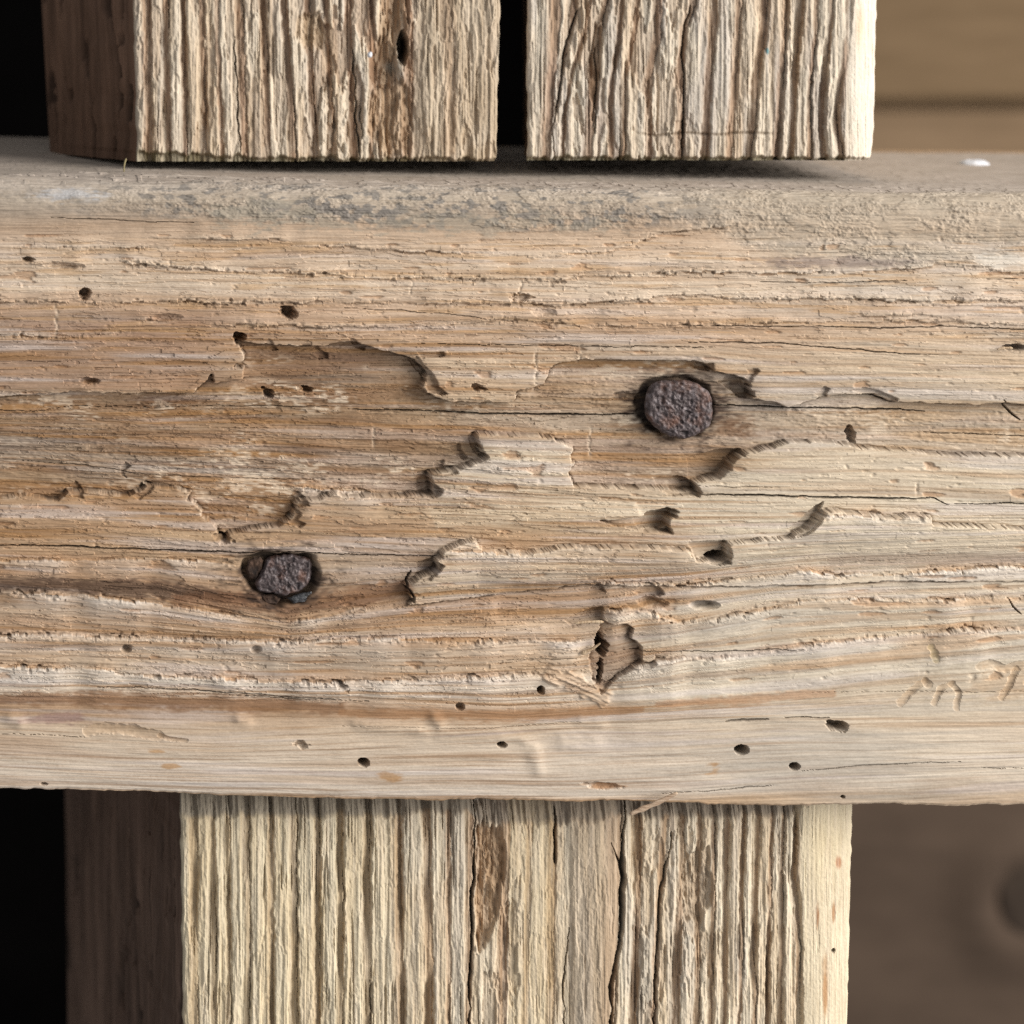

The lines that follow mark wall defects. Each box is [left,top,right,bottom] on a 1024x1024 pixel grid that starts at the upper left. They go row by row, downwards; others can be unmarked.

corrosion [184,527,361,635]
crack [671,480,1024,505]
crack [467,799,477,1024]
crack [608,800,627,1024]